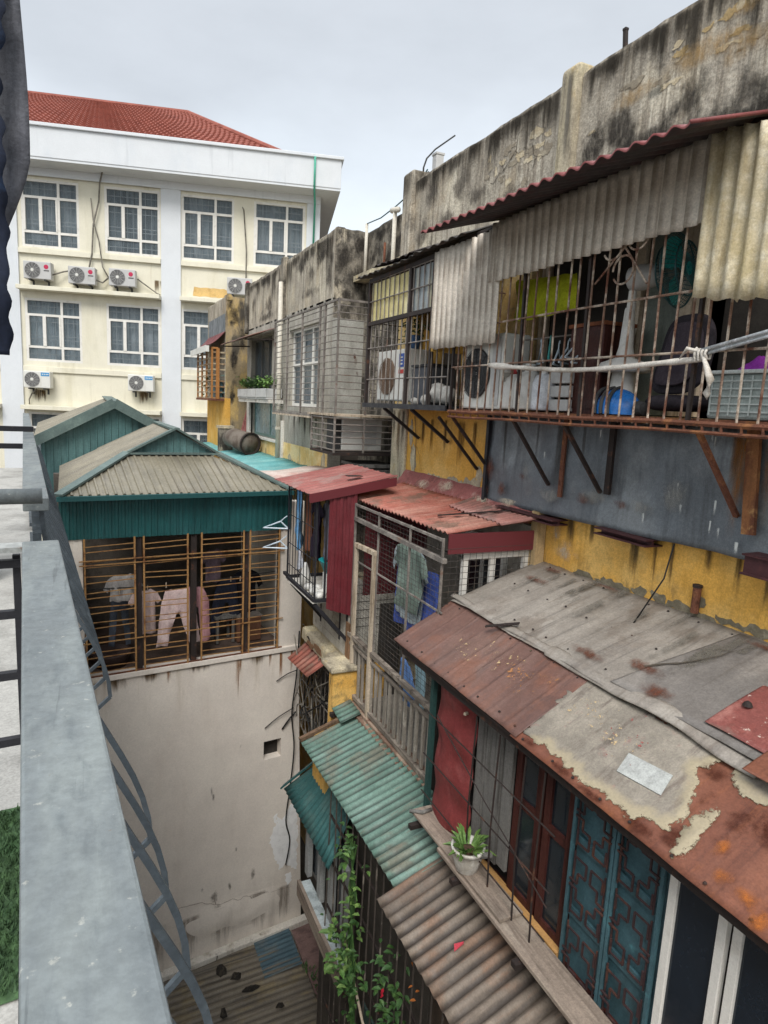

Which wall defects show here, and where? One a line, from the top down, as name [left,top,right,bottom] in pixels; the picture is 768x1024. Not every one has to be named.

water stain [636,0,722,67]
water stain [747,0,760,28]
water stain [417,74,573,201]
water stain [590,51,622,94]
water stain [582,83,699,162]
water stain [721,70,768,115]
water stain [250,228,401,320]
peeling [523,681,722,859]
peeling [731,769,768,806]
peeling [269,804,299,885]
corrosion [663,831,681,846]